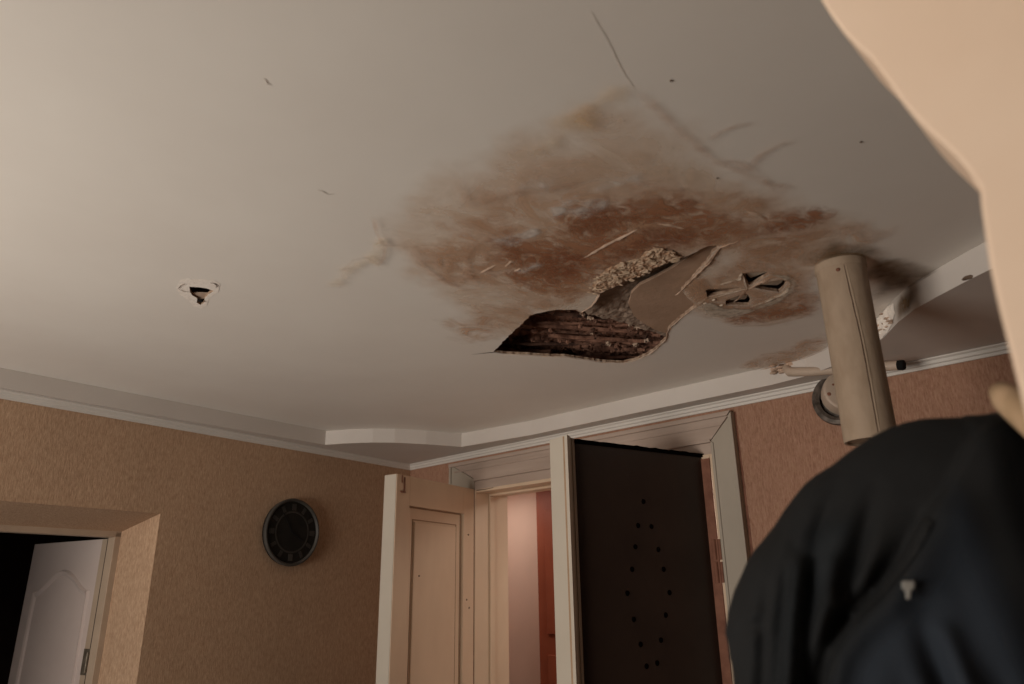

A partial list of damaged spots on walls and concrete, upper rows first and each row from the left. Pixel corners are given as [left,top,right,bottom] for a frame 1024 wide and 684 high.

spalling [176,279,220,309]
water stain [427,176,823,323]
flaking render [587,247,682,295]
water stain [874,261,923,313]